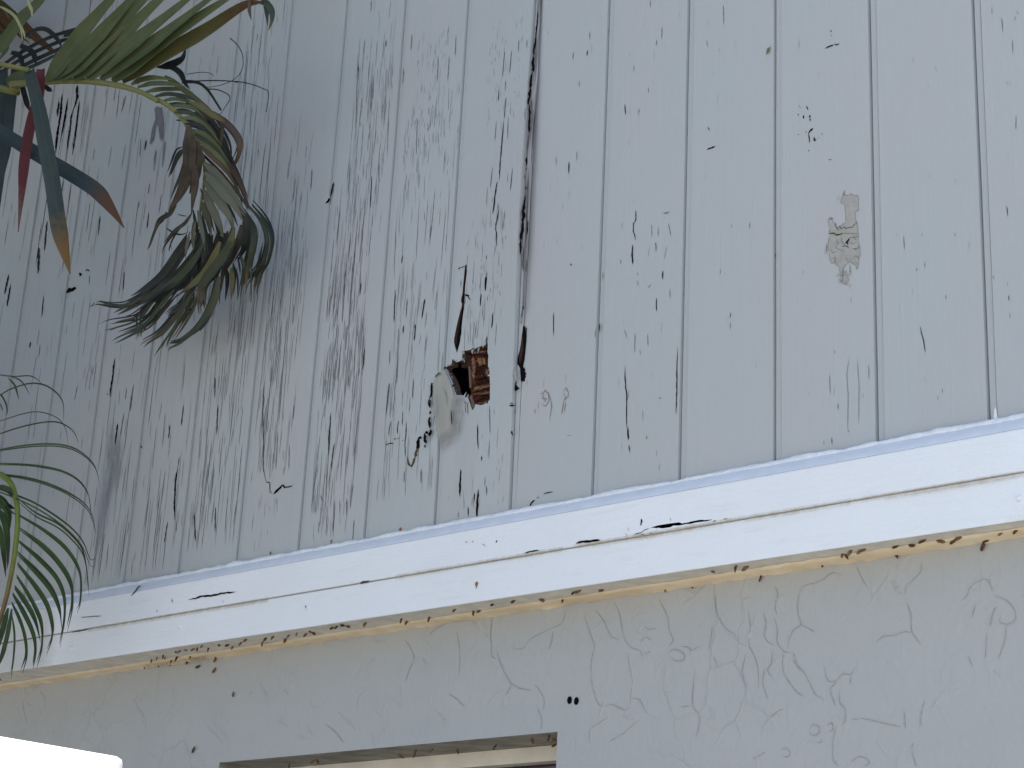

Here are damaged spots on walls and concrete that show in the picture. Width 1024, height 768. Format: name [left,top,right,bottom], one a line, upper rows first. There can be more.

peeling [826,190,861,287]
crack [0,0,549,596]
crack [171,592,233,603]
crack [405,623,464,707]
crack [489,562,925,766]
crack [961,579,1016,666]